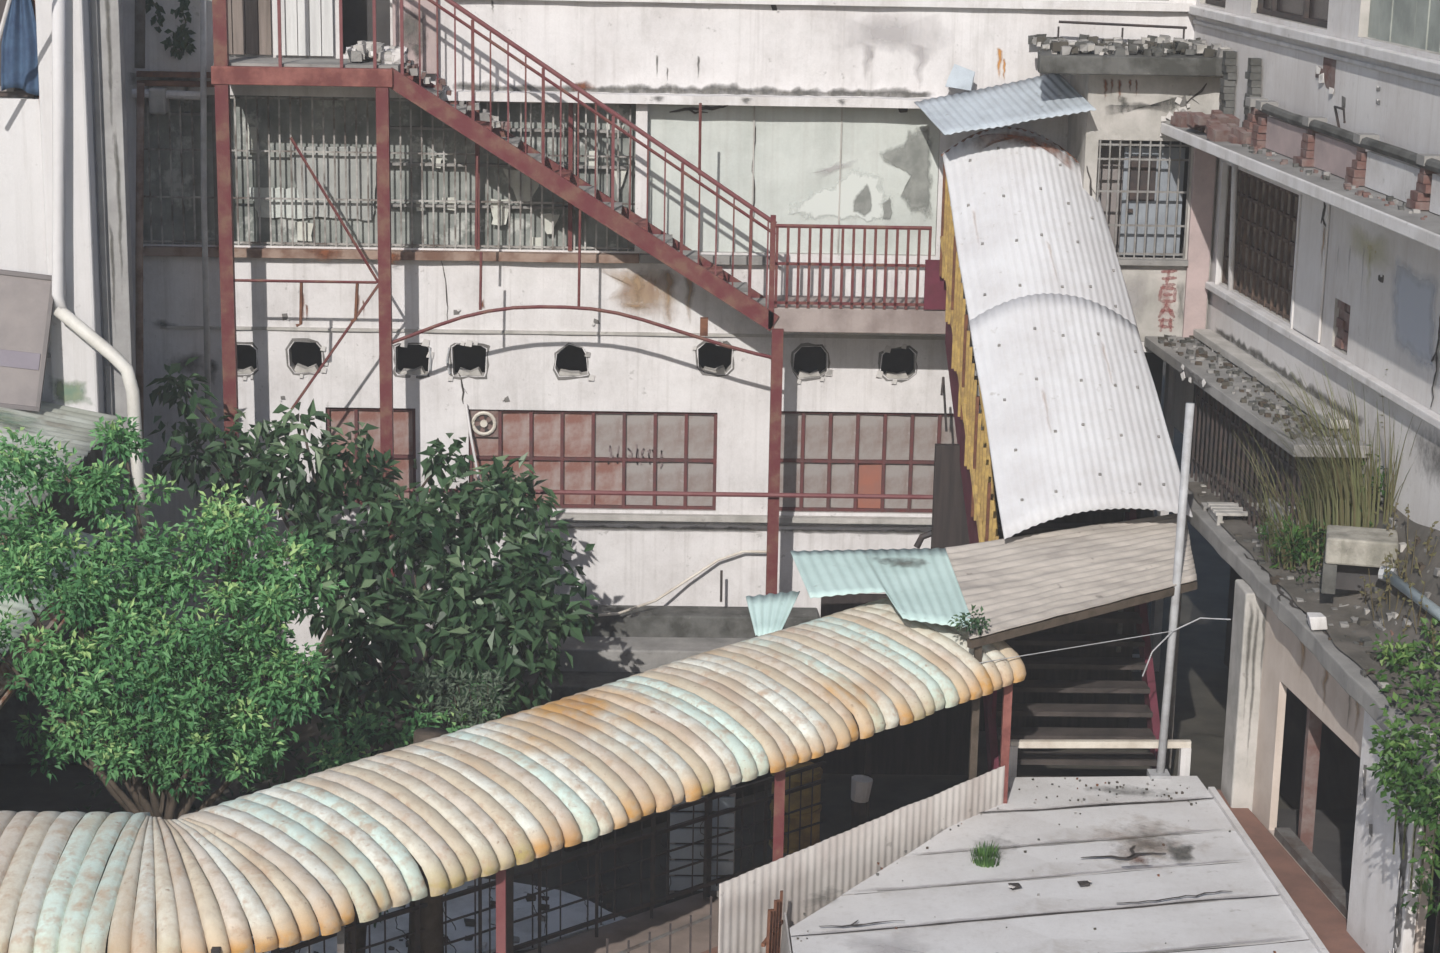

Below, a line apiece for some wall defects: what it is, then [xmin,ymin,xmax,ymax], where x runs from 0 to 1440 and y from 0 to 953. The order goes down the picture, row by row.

spalling [1315,57,1346,108]
peeling [1160,95,1190,137]
peeling [790,165,884,222]
crack [1430,317,1440,407]
water stain [1246,607,1266,715]
water stain [1171,846,1192,859]